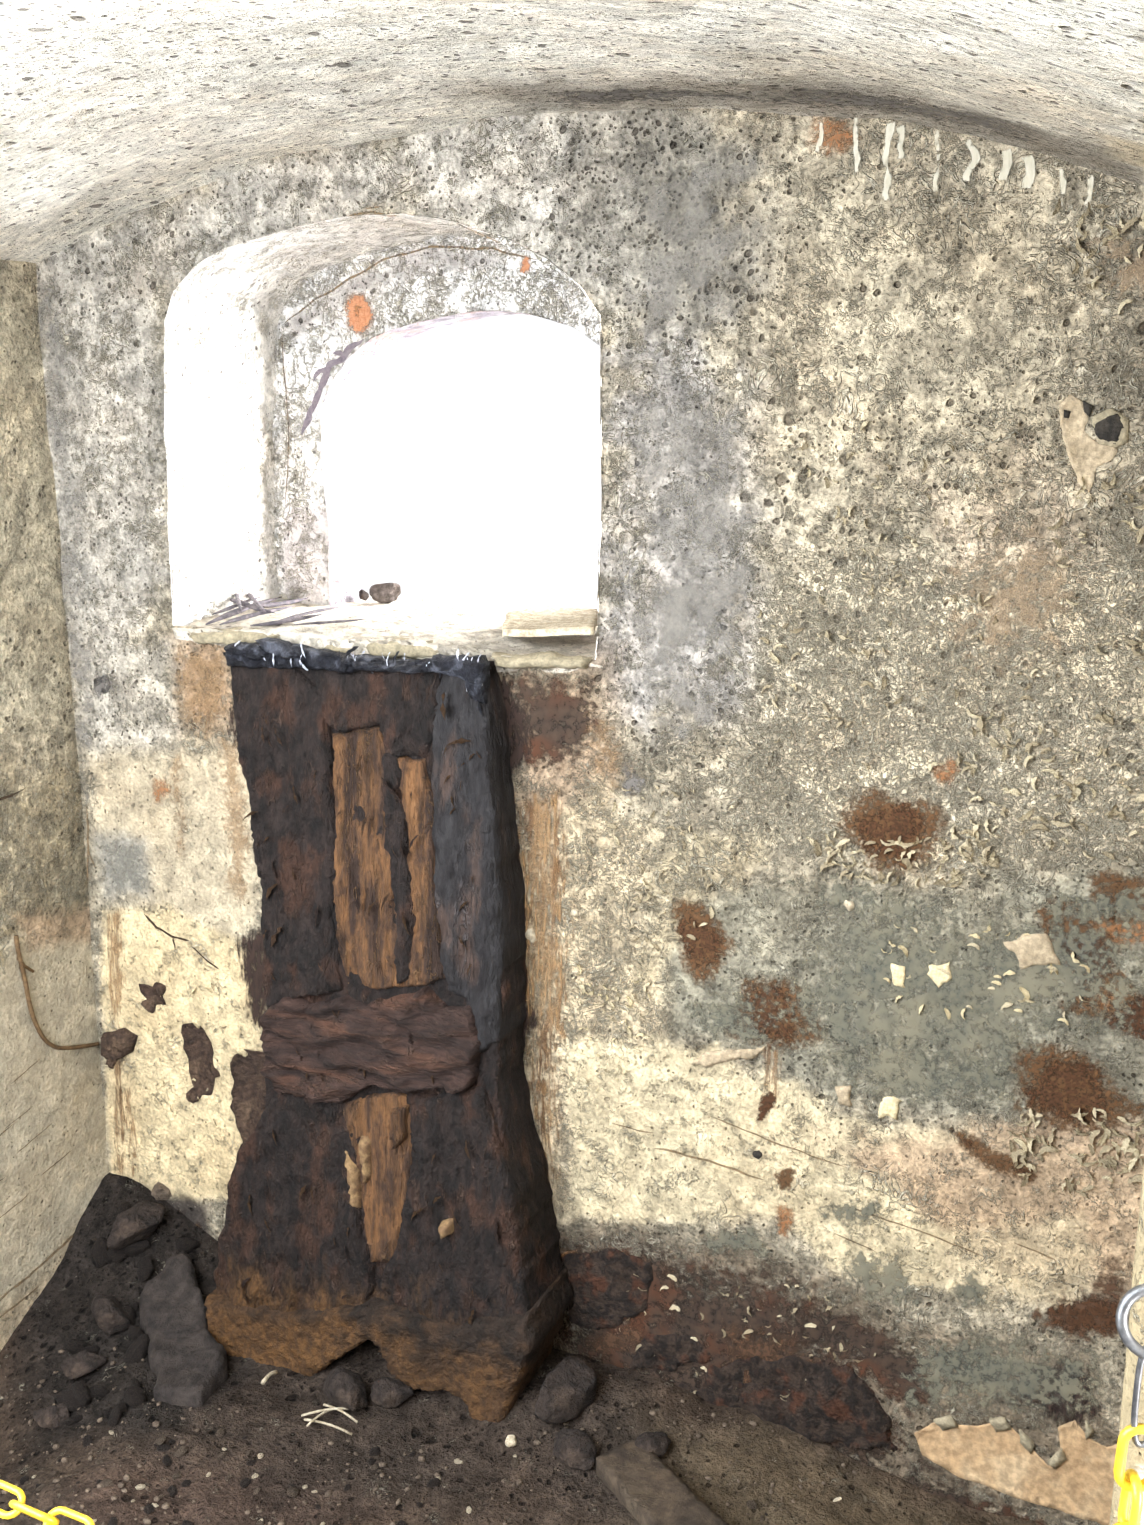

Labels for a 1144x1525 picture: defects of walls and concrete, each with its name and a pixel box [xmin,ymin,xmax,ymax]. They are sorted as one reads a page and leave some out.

corrosion [345,295,373,334]
flaking render [1059,394,1144,544]
peeling [1047,517,1070,568]
peeling [1095,630,1144,661]
crack [0,789,24,800]
corrosion [838,789,947,874]
corrosion [671,899,734,981]
corrosion [725,978,821,1121]
corrosion [1010,1043,1144,1133]
corrosion [1032,1255,1127,1342]
damp [552,1240,1101,1525]
flaking render [914,1415,1117,1525]